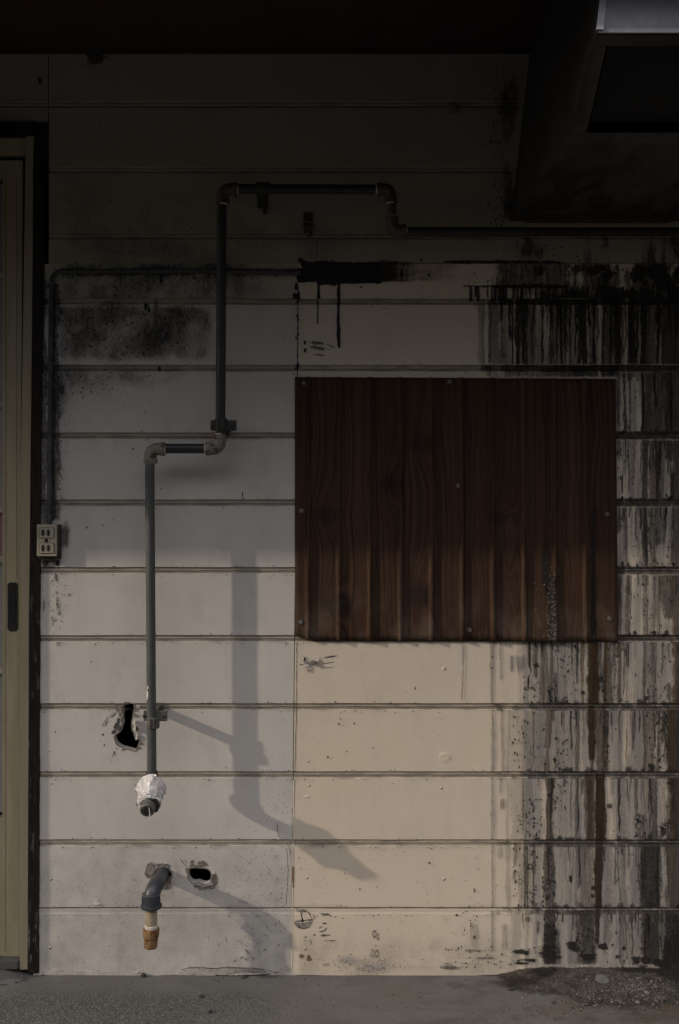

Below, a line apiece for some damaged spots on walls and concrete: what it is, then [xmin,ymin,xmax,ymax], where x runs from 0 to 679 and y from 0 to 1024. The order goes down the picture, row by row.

mould [44,237,258,512]
hole [102,702,142,757]
damp [304,237,679,975]
hole [145,859,217,890]